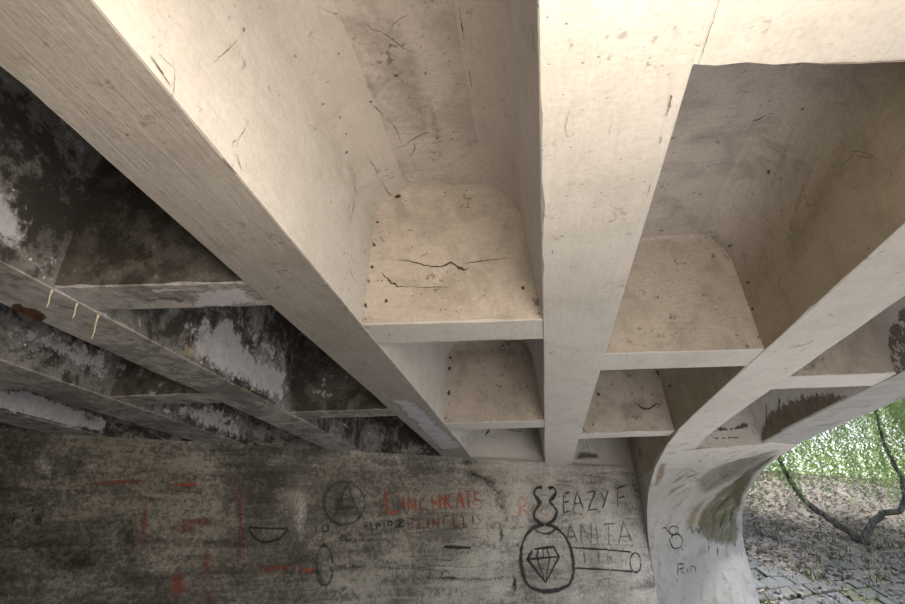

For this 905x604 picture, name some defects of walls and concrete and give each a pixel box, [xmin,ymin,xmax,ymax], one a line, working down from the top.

crack [381,258,504,288]
damp [690,451,774,527]